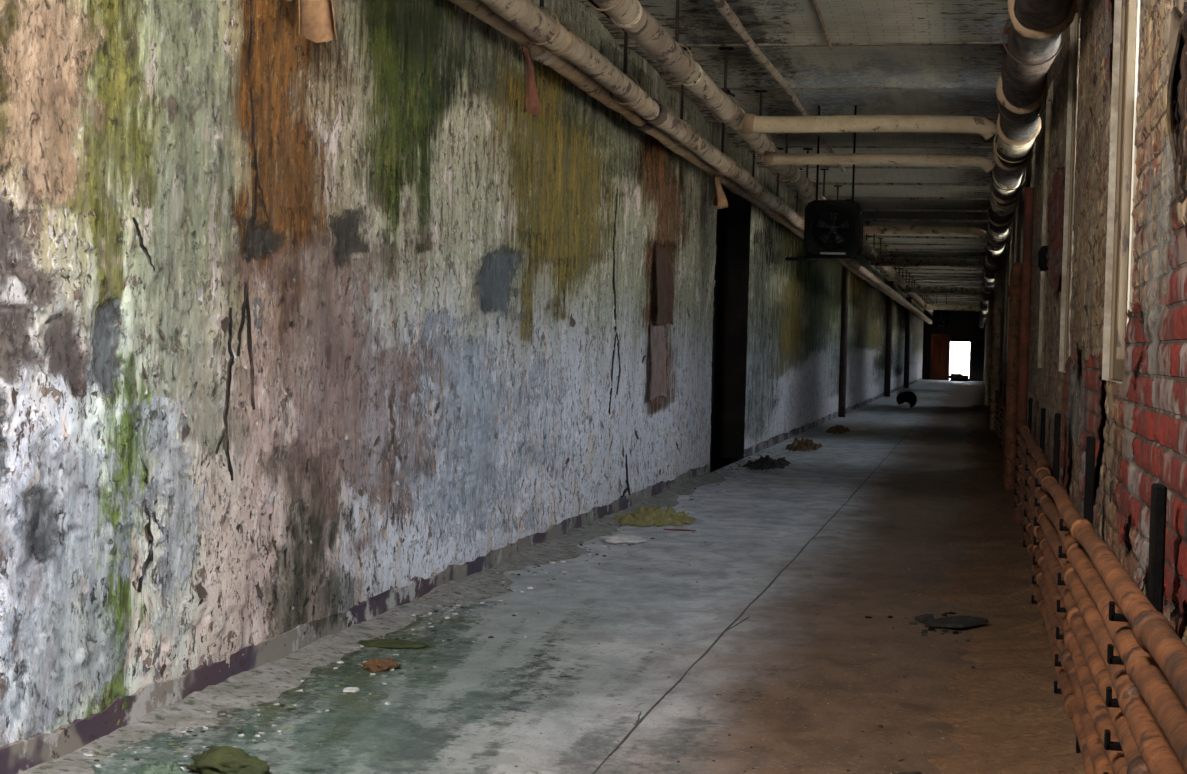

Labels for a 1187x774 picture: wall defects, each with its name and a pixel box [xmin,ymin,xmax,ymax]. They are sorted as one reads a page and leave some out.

crack [215,0,270,481]
corrosion [230,0,353,332]
flaking render [1044,144,1106,318]
peeling [142,328,174,394]
peeling [179,382,198,442]
peeling [198,275,230,358]
flaking render [1035,215,1187,634]
peeling [132,475,159,540]
crack [137,459,169,592]
peeling [196,582,208,606]
crack [592,423,917,774]